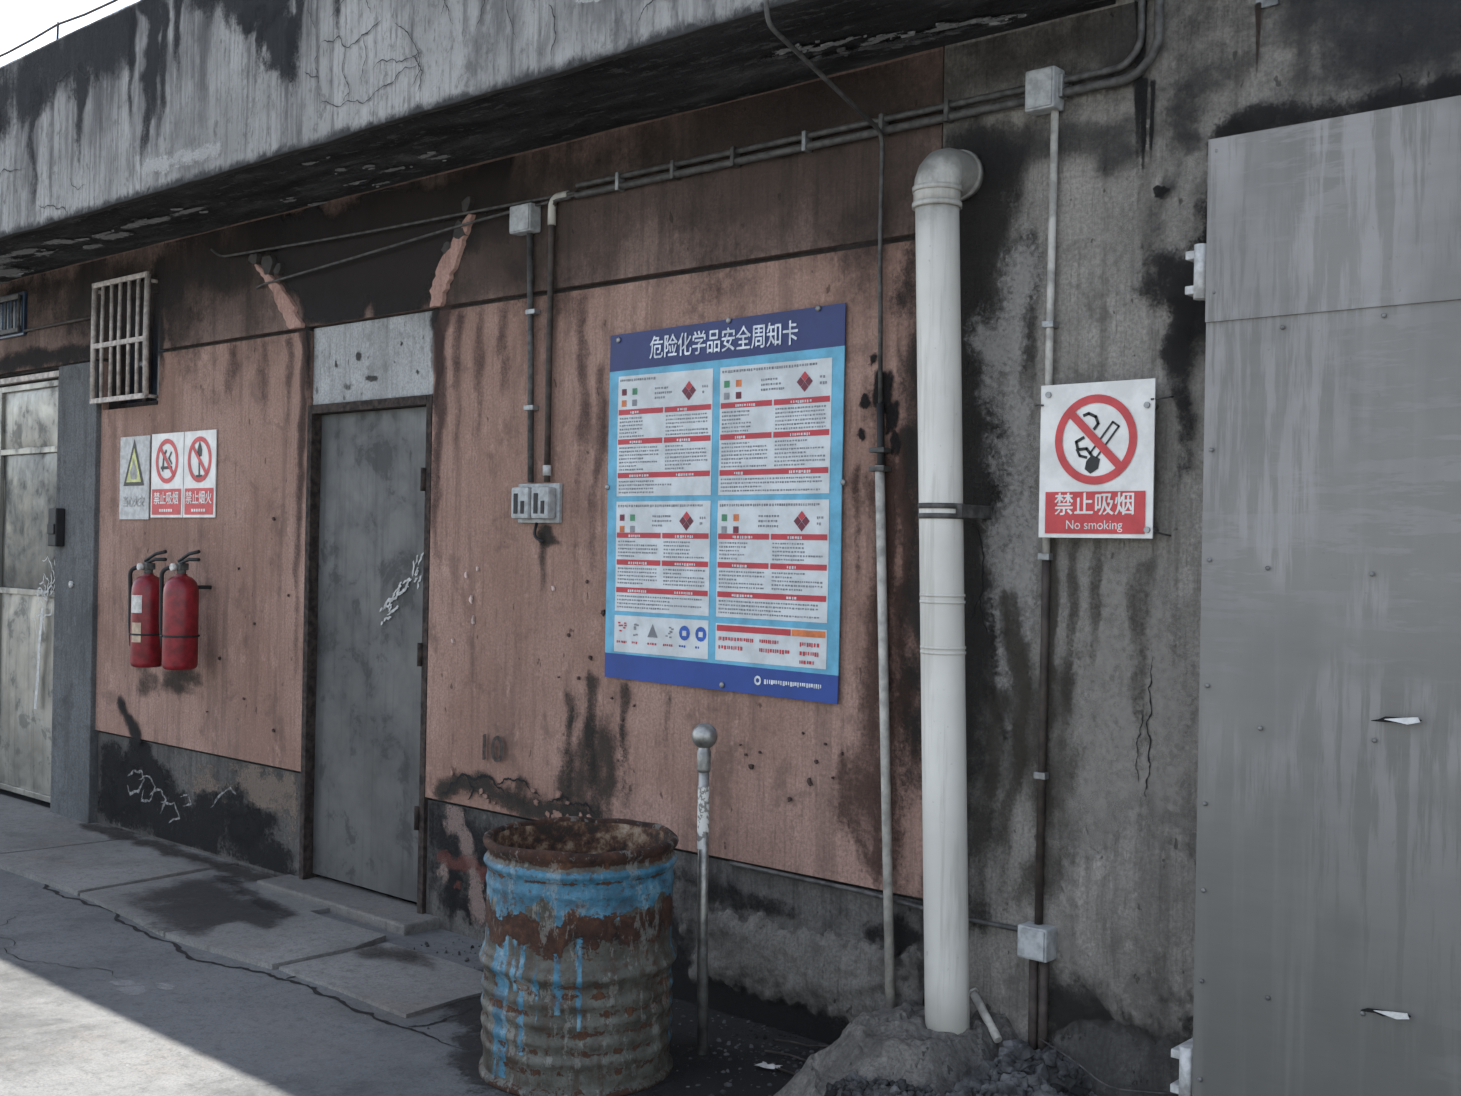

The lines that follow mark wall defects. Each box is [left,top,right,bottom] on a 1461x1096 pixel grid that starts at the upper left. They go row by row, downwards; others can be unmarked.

damp [0,0,304,191]
crack [305,0,422,107]
crack [548,5,556,51]
damp [1116,0,1241,243]
flaking render [248,253,305,330]
flaking render [430,196,476,308]
damp [834,248,922,882]
damp [957,115,1103,929]
crack [1135,658,1153,797]
damp [98,696,299,934]
flaking render [432,766,602,924]
crack [42,884,462,1049]